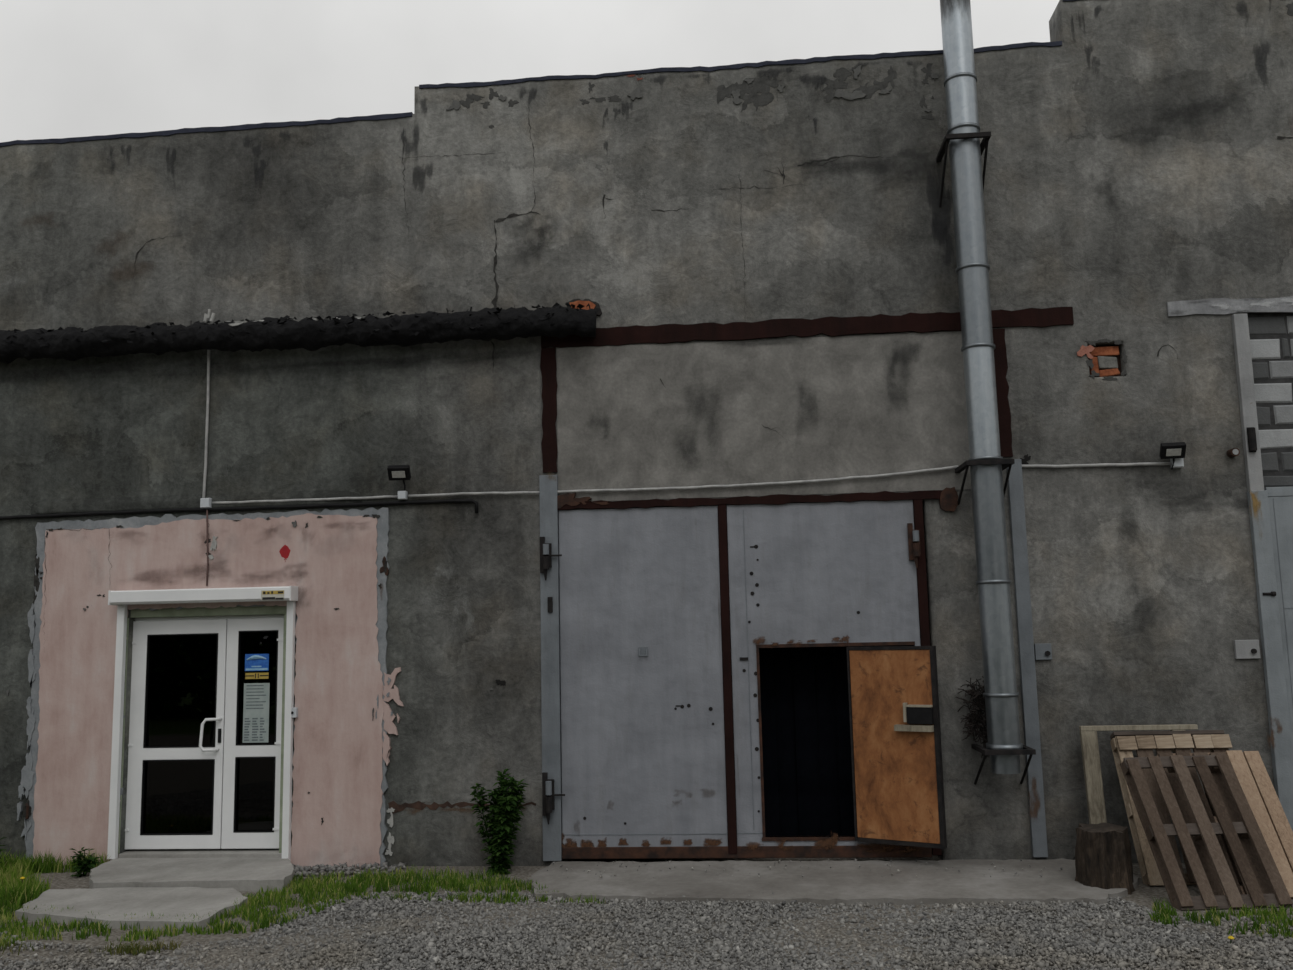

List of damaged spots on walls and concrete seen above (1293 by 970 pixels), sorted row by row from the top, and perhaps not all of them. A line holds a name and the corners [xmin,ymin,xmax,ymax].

damp [1255,47,1268,76]
spalling [717,74,785,112]
spalling [821,65,897,102]
crack [399,115,541,308]
peeling [372,667,404,766]
corrosion [562,834,722,848]